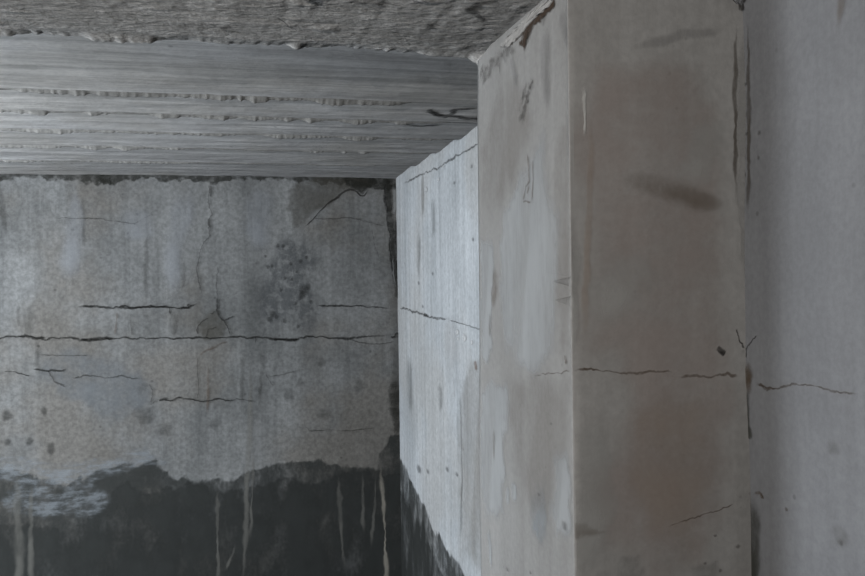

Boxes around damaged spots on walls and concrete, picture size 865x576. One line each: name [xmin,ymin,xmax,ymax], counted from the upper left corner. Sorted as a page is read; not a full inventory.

crack [466,1,497,22]
crack [0,299,371,342]
crack [321,305,479,330]
crack [160,395,247,403]
leakage [0,384,464,576]